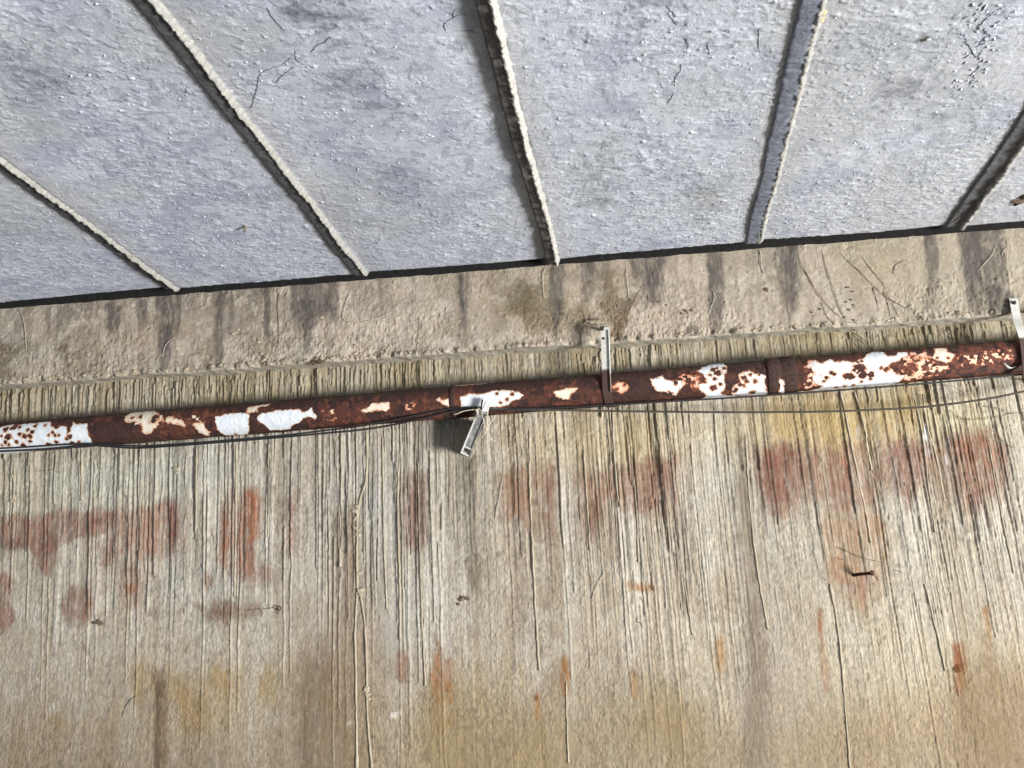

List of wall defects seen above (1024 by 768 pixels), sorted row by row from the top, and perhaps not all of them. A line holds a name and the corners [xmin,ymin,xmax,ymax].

crack [251,10,333,108]
leakage [106,301,120,330]
leakage [138,295,181,369]
leakage [215,291,233,354]
spalling [210,342,391,367]
leakage [291,282,339,336]
leakage [458,272,468,326]
leakage [708,252,724,328]
leakage [780,245,798,303]
leakage [924,235,938,291]
leakage [961,230,1013,308]
corrosion [221,492,255,575]